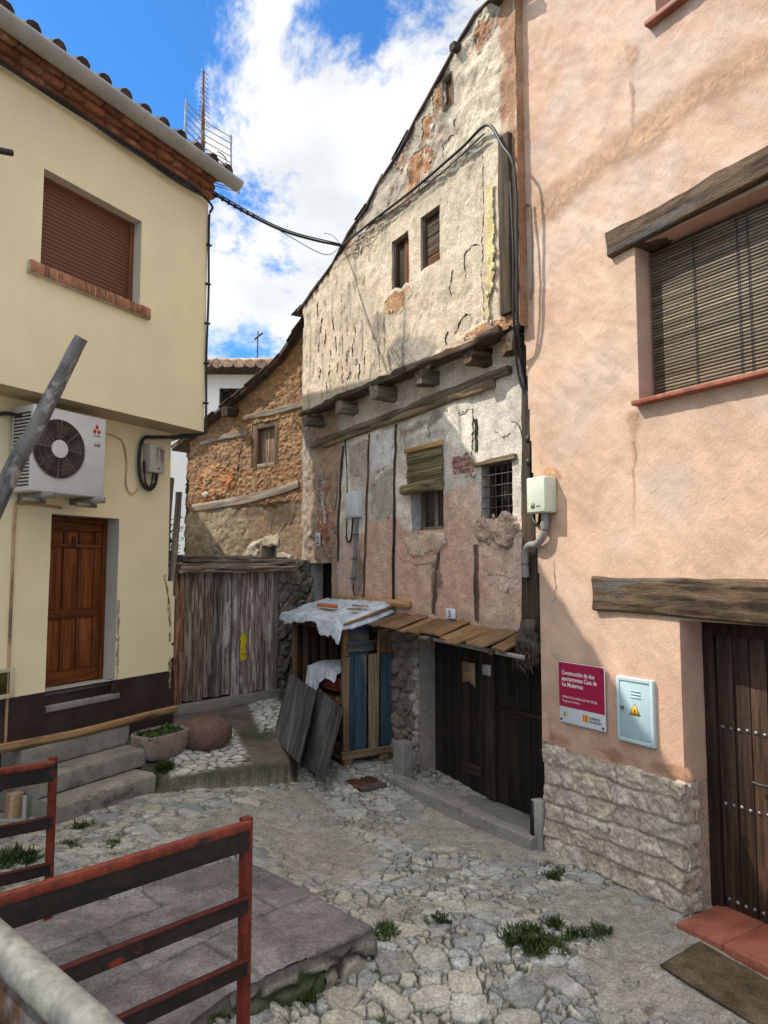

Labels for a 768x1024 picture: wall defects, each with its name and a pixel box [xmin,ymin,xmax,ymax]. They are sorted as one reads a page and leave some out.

flaking render [469,10,498,55]
flaking render [393,83,446,195]
crack [444,146,485,346]
flaking render [383,282,413,320]
flaking render [347,426,476,522]